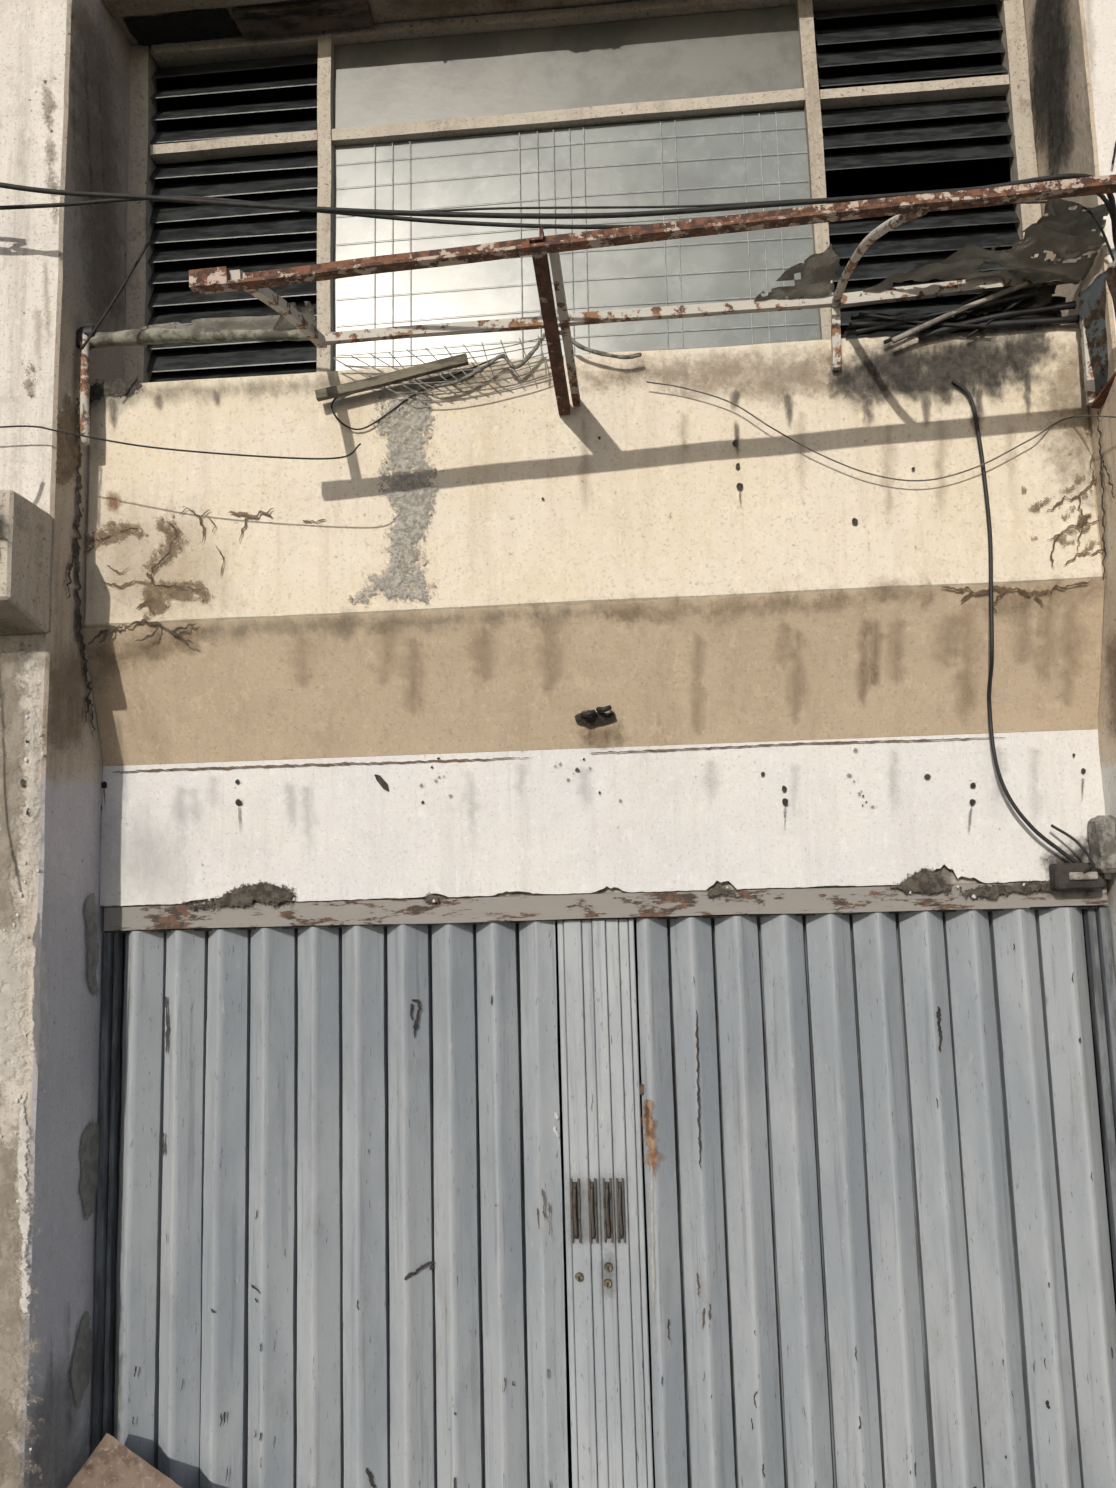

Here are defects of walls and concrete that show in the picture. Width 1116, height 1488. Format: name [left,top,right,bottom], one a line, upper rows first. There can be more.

water stain [829,326,1055,430]
crack [66,398,326,738]
crack [942,409,1114,613]
crack [112,756,537,773]
peeling [0,642,49,1488]
spalling [71,1311,94,1408]